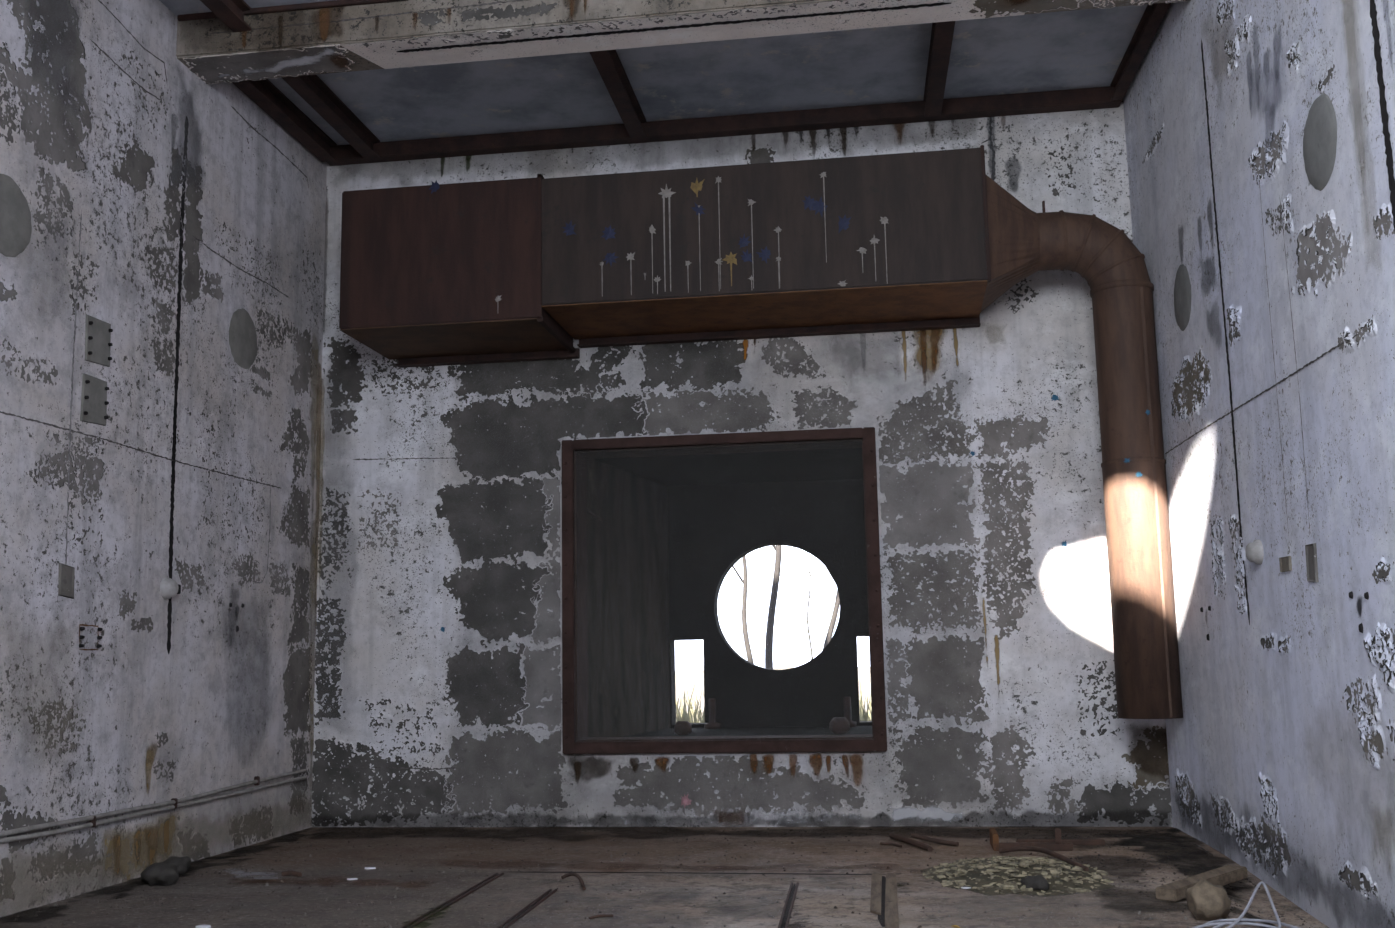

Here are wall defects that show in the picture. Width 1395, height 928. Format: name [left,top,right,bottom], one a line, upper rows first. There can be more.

peeling [1248,119,1290,188]
peeling [1265,193,1353,299]
peeling [1371,203,1395,243]
corrosion [902,328,959,383]
peeling [1004,278,1040,315]
peeling [1171,347,1213,429]
peeling [1227,304,1242,348]
peeling [109,44,868,849]
peeling [875,375,1292,881]
peeling [1341,622,1395,771]
corrosion [750,753,863,785]